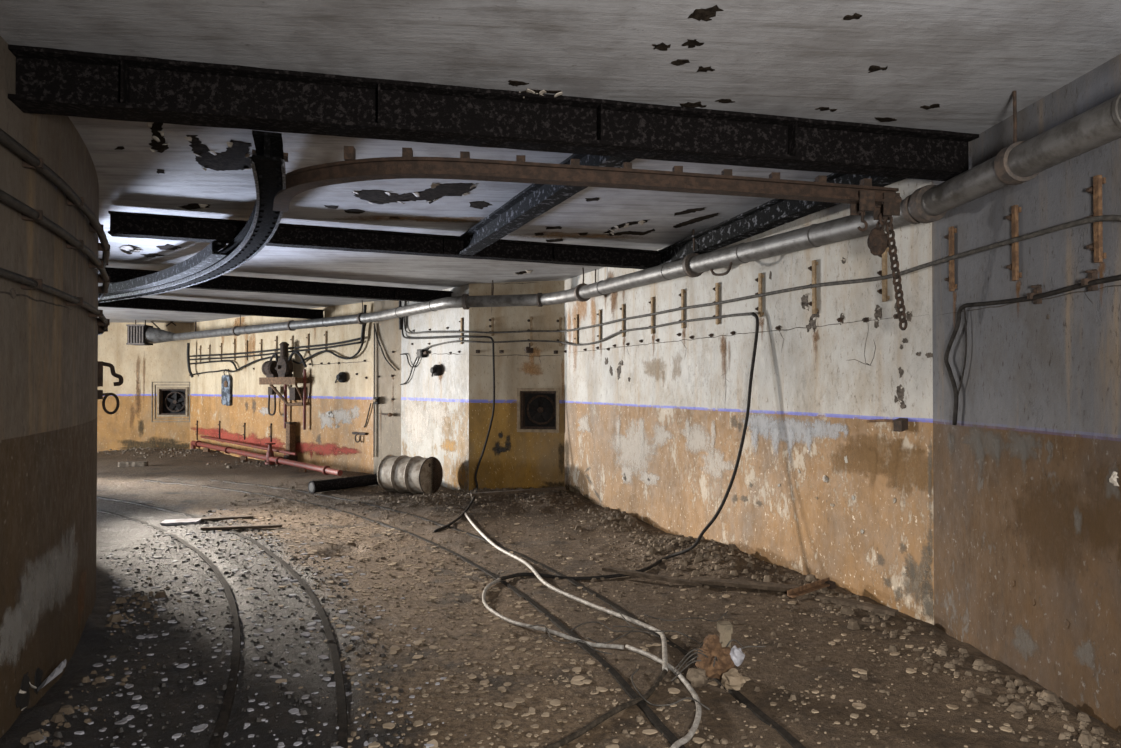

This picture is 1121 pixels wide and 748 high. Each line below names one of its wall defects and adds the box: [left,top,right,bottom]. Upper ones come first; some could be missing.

peeling [184,135,252,171]
peeling [324,183,491,219]
peeling [320,406,359,428]